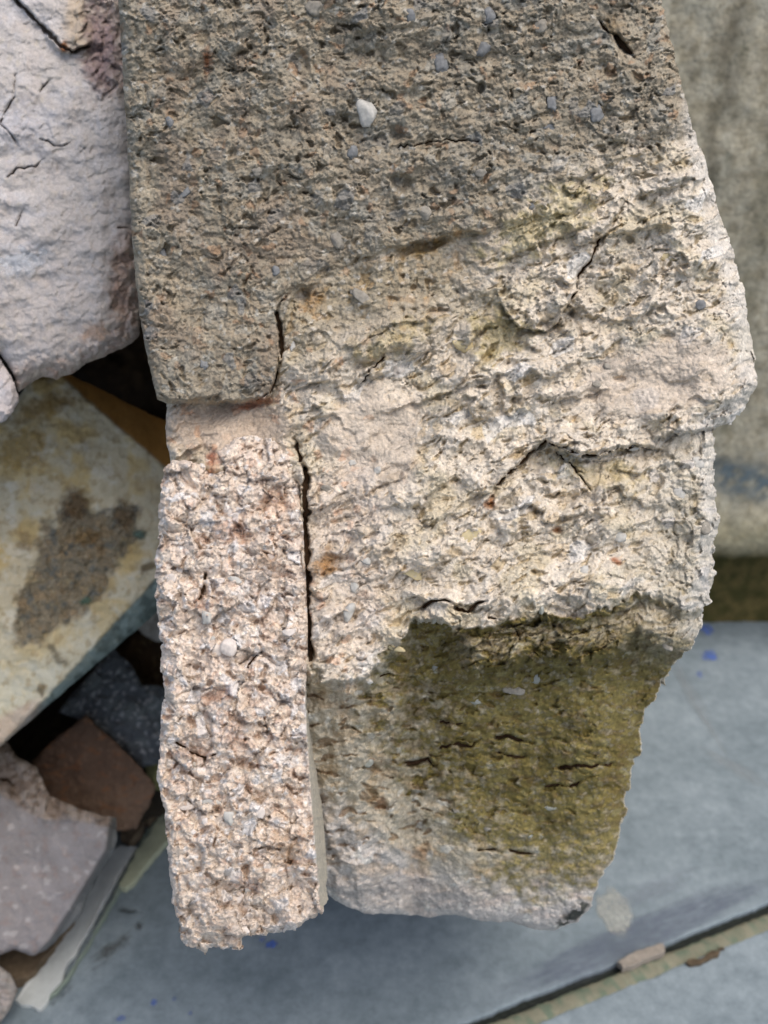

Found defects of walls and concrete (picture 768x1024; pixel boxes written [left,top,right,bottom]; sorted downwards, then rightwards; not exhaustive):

crack [598,19,632,54]
crack [159,146,758,684]
leakage [354,593,684,932]